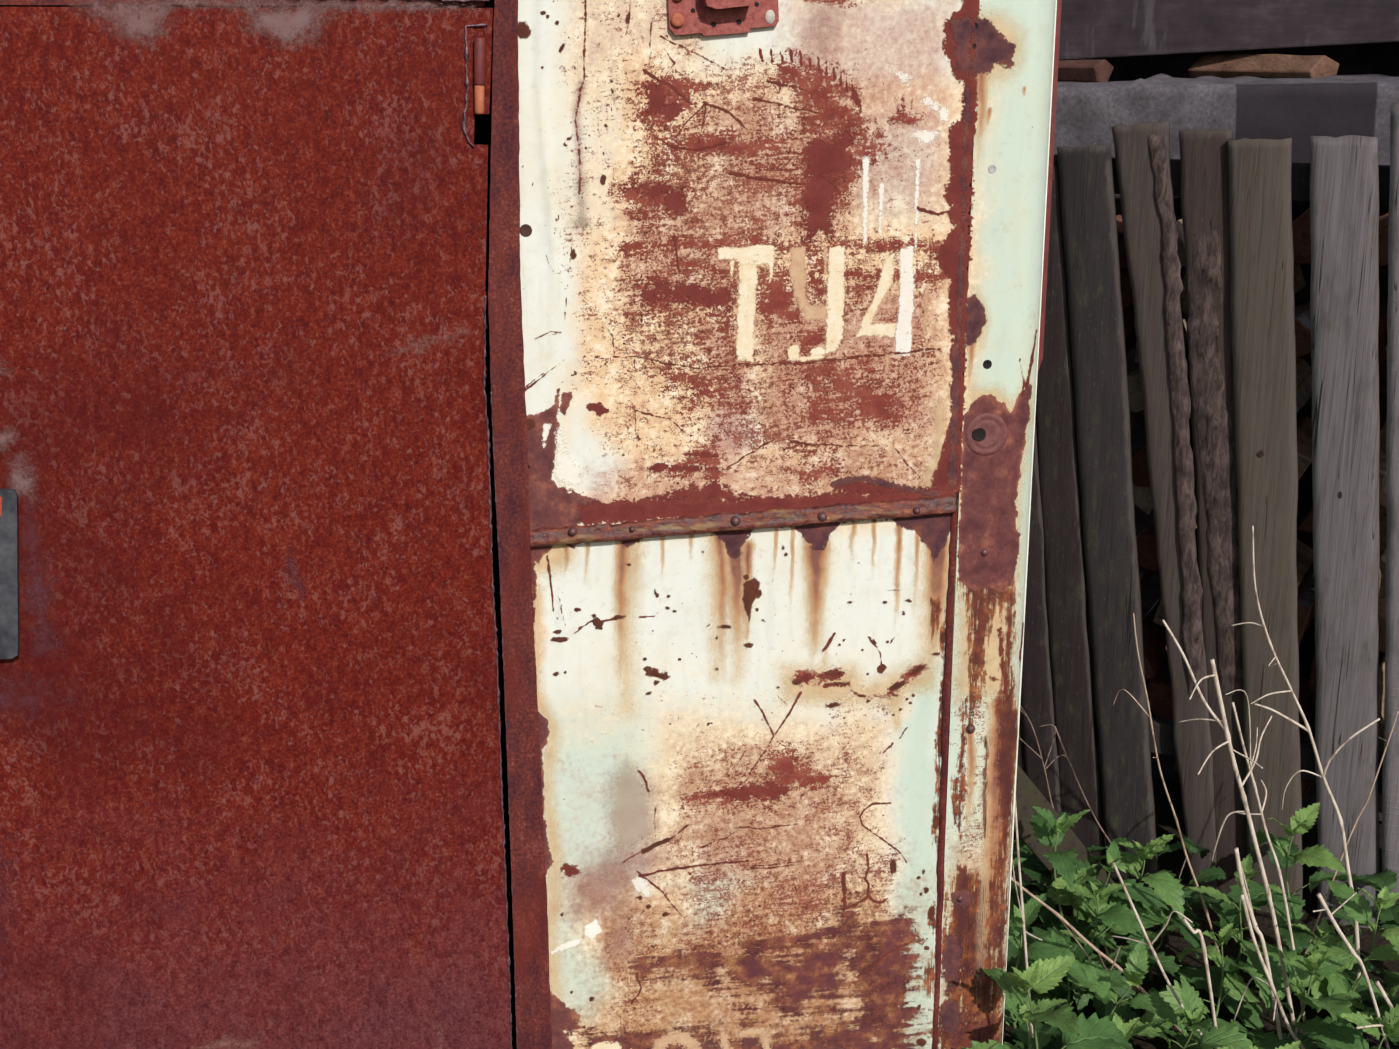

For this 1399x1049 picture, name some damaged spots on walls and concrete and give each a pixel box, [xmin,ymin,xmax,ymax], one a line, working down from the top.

peeling [527,388,602,530]
rust [530,0,1024,1049]
spalling [742,575,762,637]
spalling [643,666,670,695]
peeling [788,663,930,724]
peeling [631,872,653,900]
peeling [550,919,602,954]